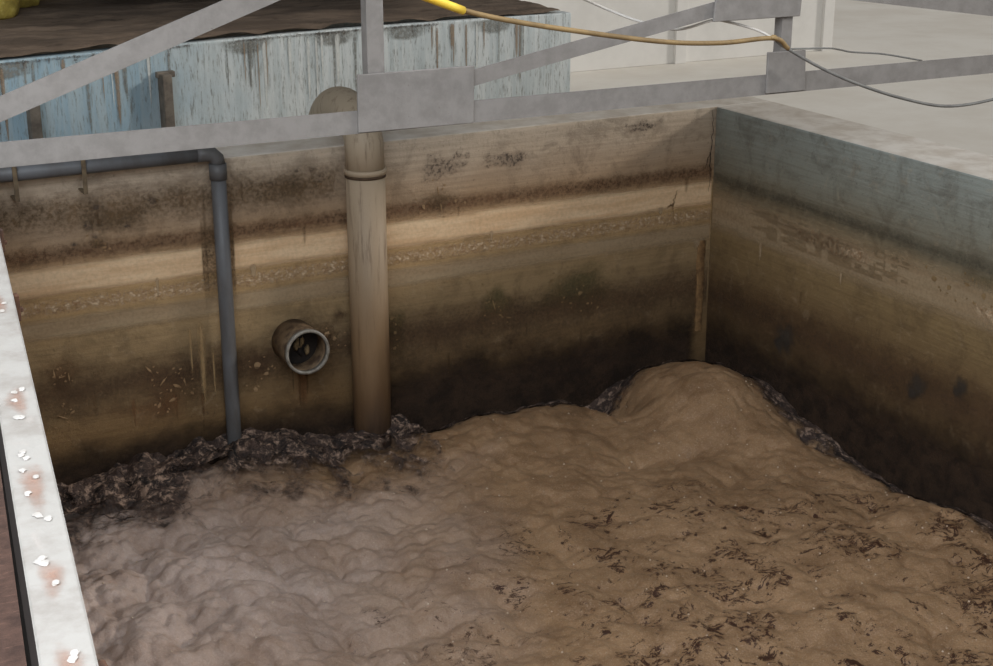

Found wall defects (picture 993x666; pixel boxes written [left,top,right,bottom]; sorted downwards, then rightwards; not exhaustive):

damp [226,29,357,107]
damp [0,187,219,340]
damp [229,213,349,309]
damp [386,167,993,330]
rust [11,387,25,419]
damp [36,326,223,411]
damp [390,317,693,432]
damp [705,324,993,524]
rust [17,449,39,496]
rust [33,555,60,586]
rust [63,649,80,666]